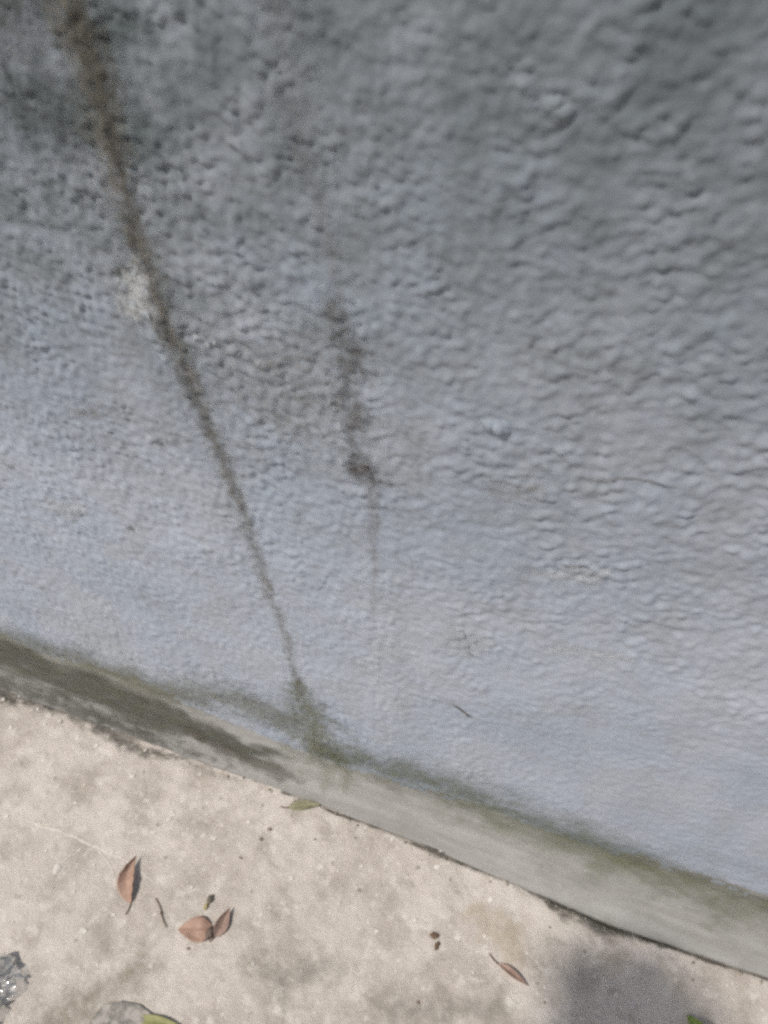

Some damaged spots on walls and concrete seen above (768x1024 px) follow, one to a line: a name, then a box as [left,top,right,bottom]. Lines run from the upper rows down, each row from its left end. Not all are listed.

damp [0,641,283,773]